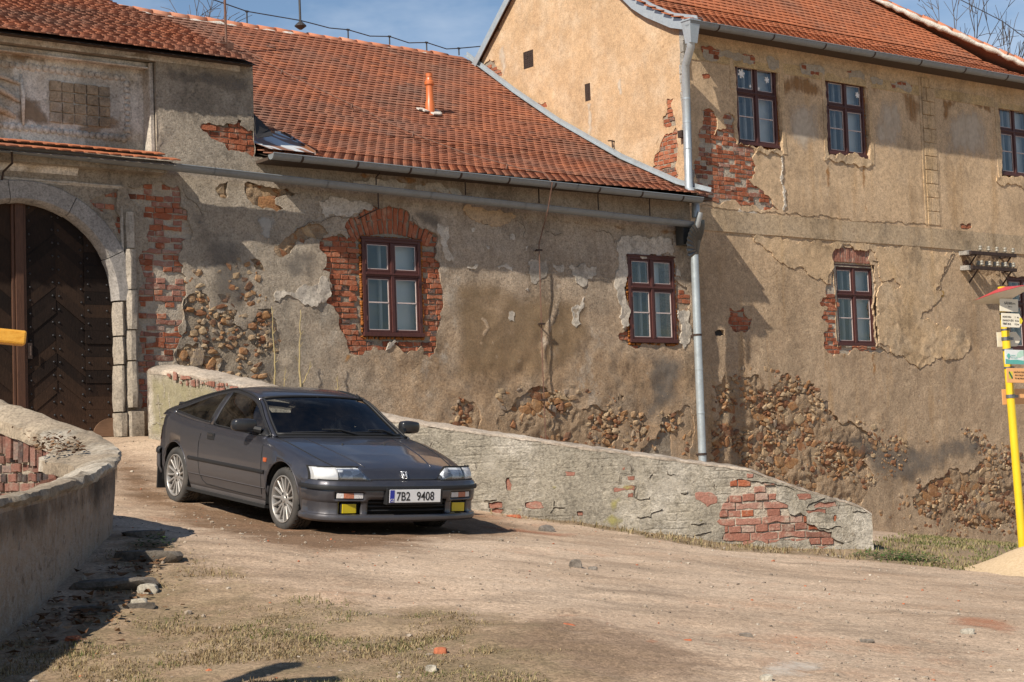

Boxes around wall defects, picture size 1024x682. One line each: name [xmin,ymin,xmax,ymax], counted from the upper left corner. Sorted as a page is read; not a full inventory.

spalling [200,120,255,157]
spalling [654,99,678,178]
spalling [693,108,787,213]
flaking render [89,182,454,408]
flaking render [351,177,597,327]
flaking render [614,234,692,349]
spalling [715,308,752,336]
flaking render [752,234,1012,369]
flaking render [0,456,54,495]
spalling [495,385,692,456]
spalling [695,366,909,548]
spalling [879,427,1024,537]